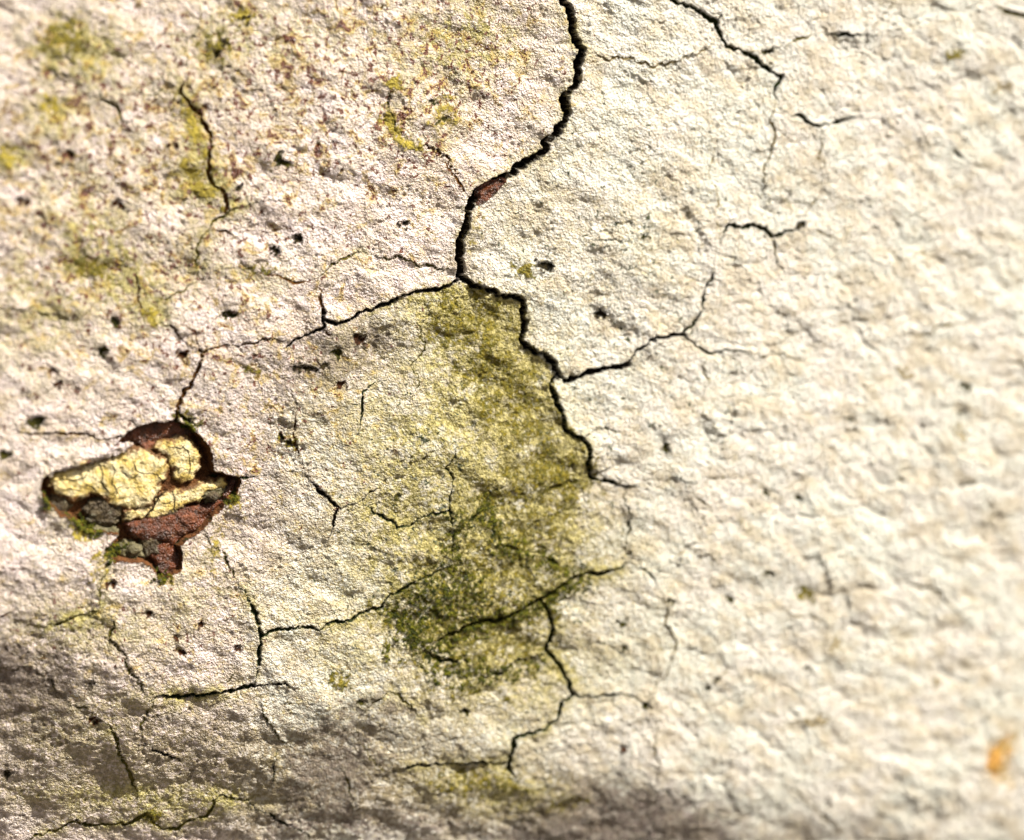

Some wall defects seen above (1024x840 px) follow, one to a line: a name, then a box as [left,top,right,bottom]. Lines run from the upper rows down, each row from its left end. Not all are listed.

crack [487,0,894,266]
crack [4,306,74,323]
crack [9,0,806,801]
spalling [38,416,243,585]
crack [780,608,828,630]
crack [0,666,314,840]
crack [338,763,355,813]
crack [780,783,842,831]